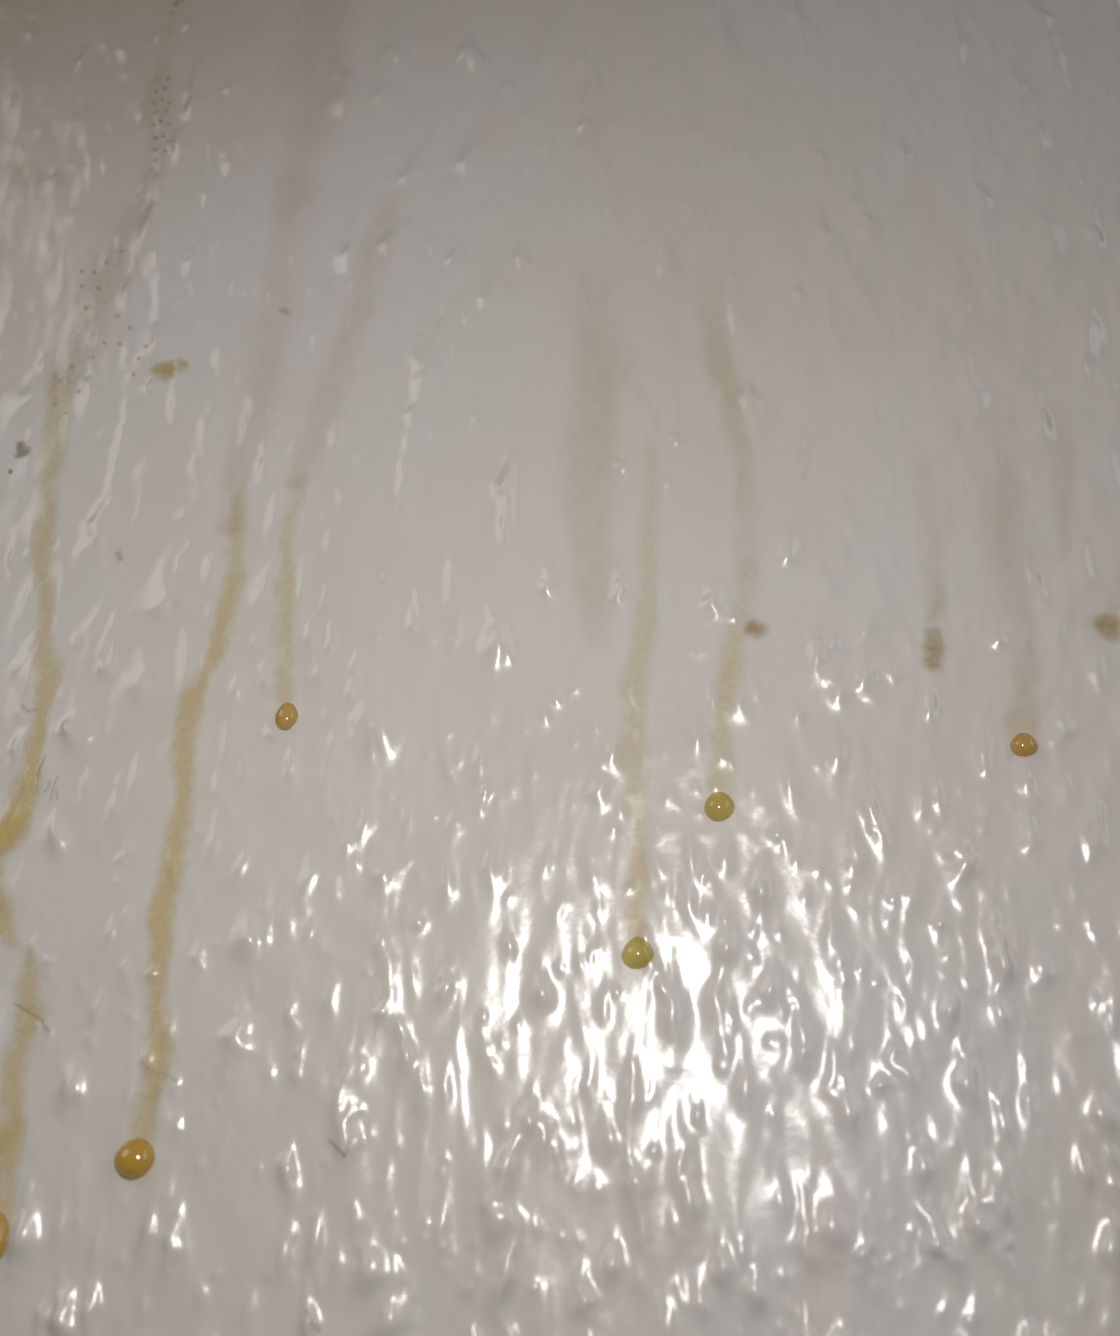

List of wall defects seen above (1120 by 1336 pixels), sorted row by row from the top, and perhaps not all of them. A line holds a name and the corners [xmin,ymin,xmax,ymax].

water stain [0,1202,9,1259]